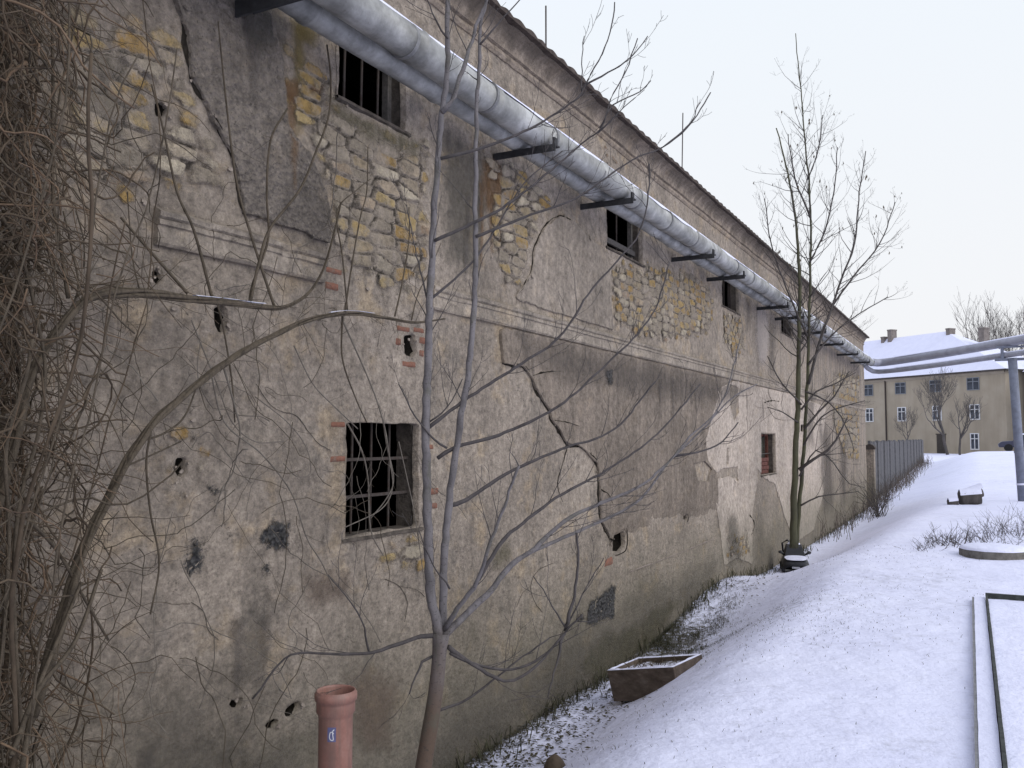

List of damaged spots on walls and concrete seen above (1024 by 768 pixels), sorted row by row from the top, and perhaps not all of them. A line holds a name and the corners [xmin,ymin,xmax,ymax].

crack [181,24,243,214]
flaking render [49,0,431,295]
flaking render [396,325,425,368]
flaking render [482,150,745,358]
crack [502,363,614,541]
spalling [580,585,616,625]